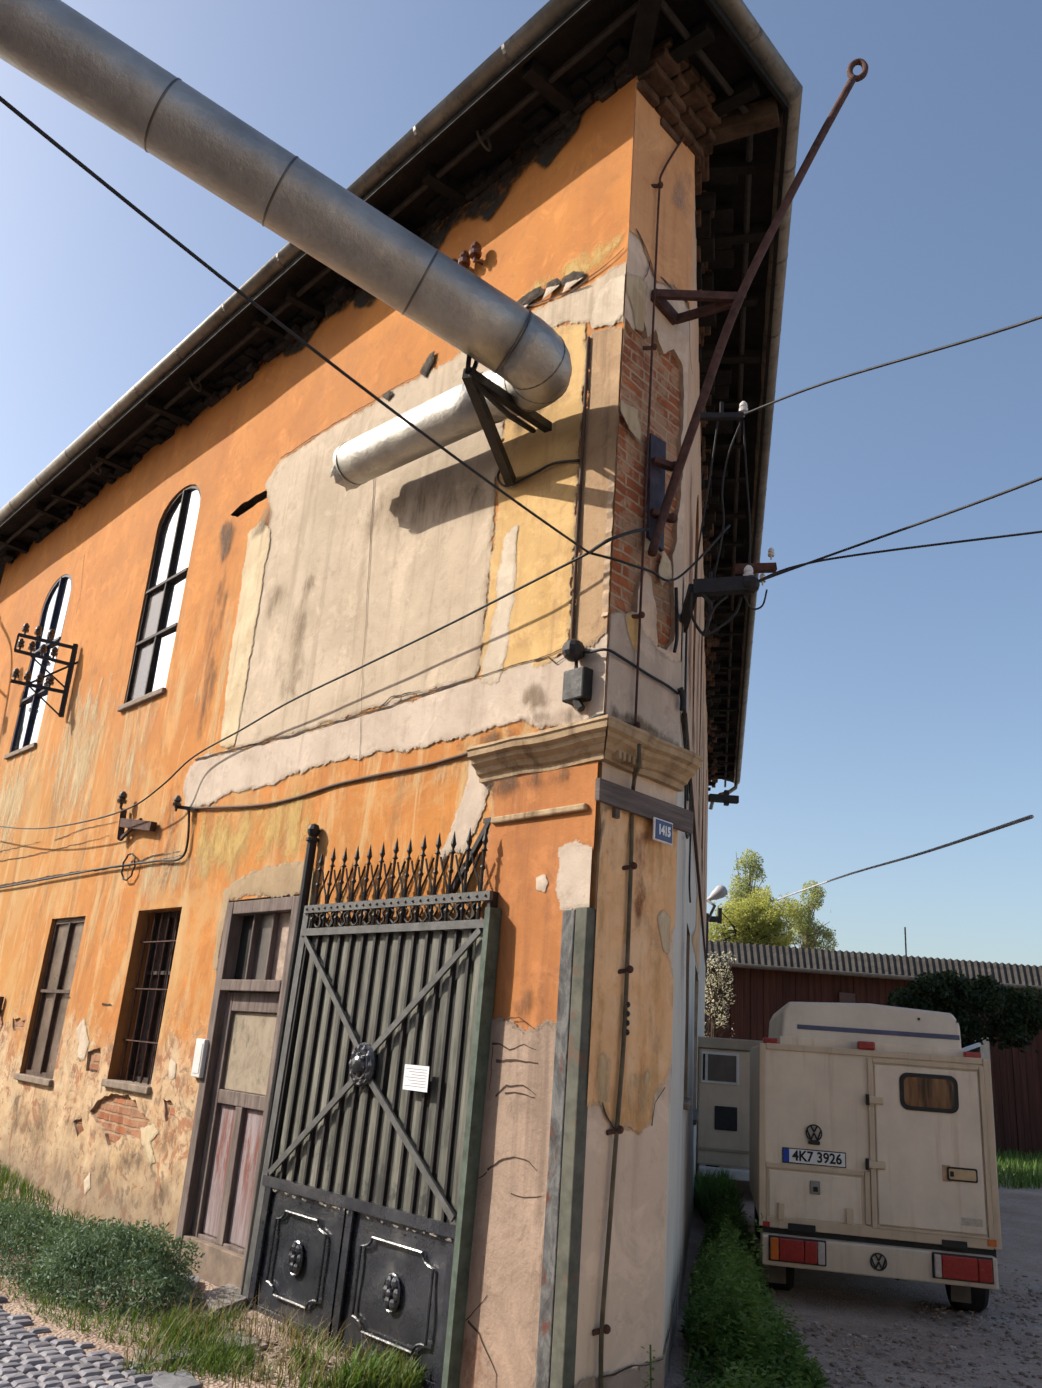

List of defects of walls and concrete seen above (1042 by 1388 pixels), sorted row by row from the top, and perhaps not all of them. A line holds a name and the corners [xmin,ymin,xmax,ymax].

flaking render [420,351,435,377]
flaking render [601,272,684,652]
spalling [231,490,267,517]
crack [489,1017,538,1098]
flaking render [73,1093,175,1165]
crack [478,1156,541,1198]
crack [465,1296,497,1378]